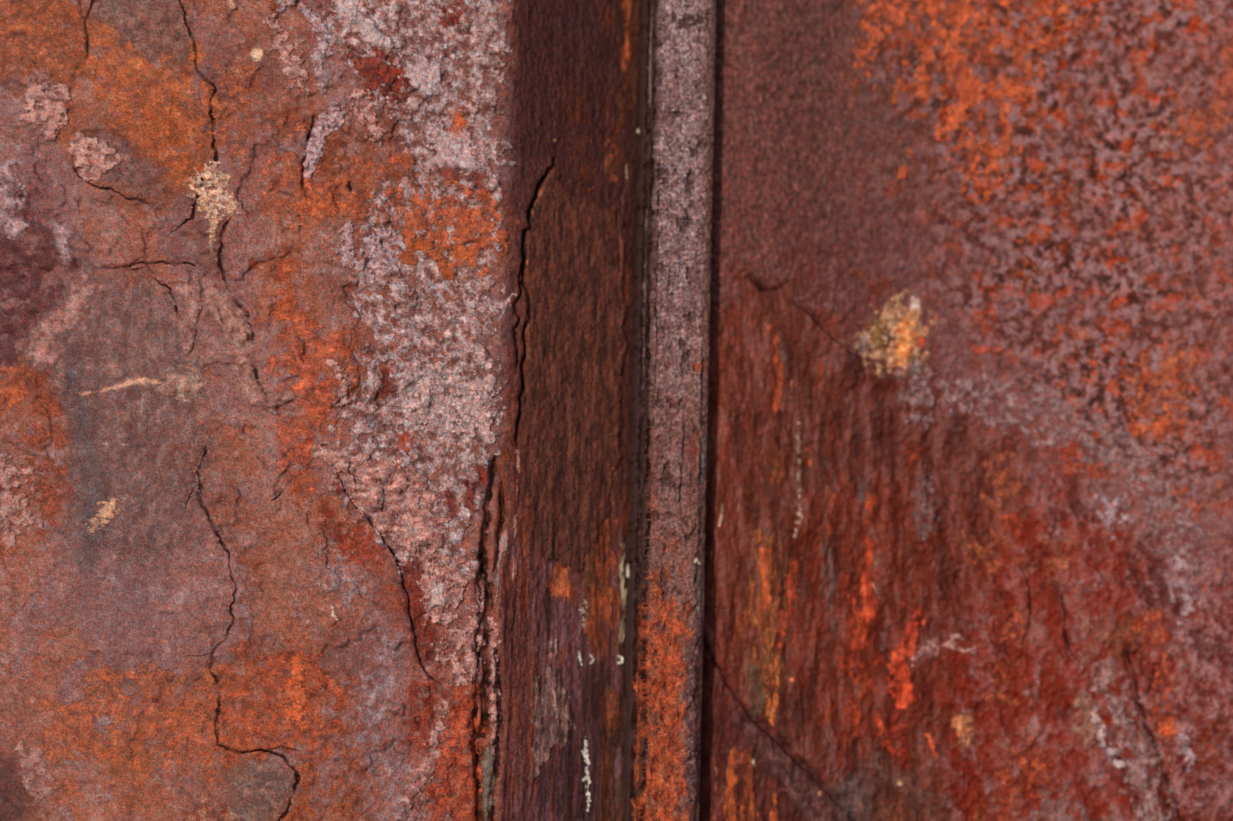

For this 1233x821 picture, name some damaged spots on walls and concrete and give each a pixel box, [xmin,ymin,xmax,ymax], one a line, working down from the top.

crack [73,162,140,200]
crack [109,0,270,409]
crack [185,448,300,821]
corrosion [0,0,519,821]
crack [367,518,424,669]
crack [474,475,505,821]
crack [513,163,554,437]
corrosion [550,500,621,659]
corrosion [630,567,777,821]
corrosion [736,324,812,725]
corrosion [808,488,1015,768]
corrosion [841,0,1105,231]